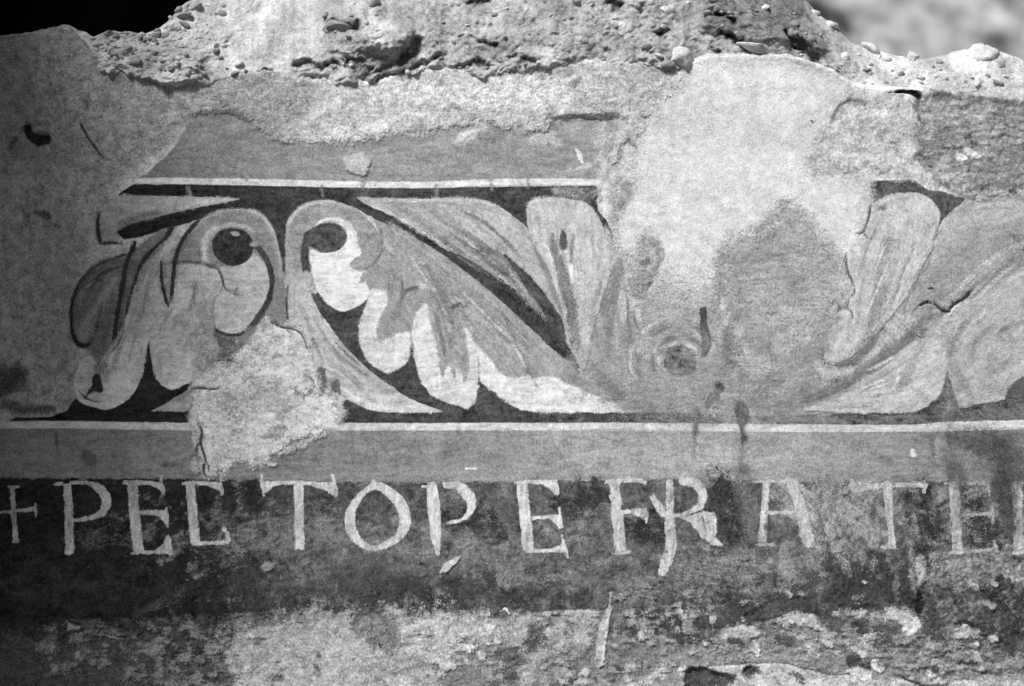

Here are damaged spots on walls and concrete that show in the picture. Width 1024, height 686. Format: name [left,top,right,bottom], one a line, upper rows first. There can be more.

crack [195,425,210,476]
flaking render [186,296,349,484]
damp [691,190,879,608]
flaking render [29,567,1024,686]